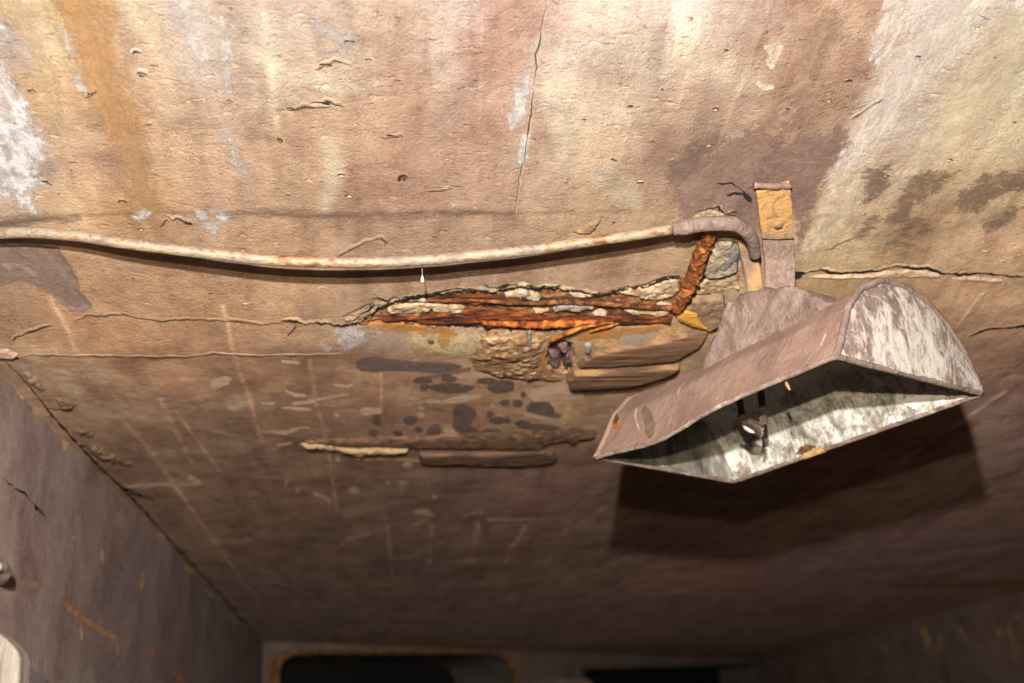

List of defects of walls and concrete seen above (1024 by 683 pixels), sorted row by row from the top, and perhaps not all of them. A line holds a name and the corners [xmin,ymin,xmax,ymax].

water stain [0,61,47,214]
crack [515,0,549,214]
water stain [799,0,976,263]
water stain [956,170,1024,233]
flaking render [209,376,232,390]
corrosion [369,320,457,350]
water stain [316,325,562,437]
spalling [260,275,682,468]
corrosion [469,231,717,341]
water stain [594,326,684,349]
crack [795,235,1024,283]
crack [0,303,384,637]